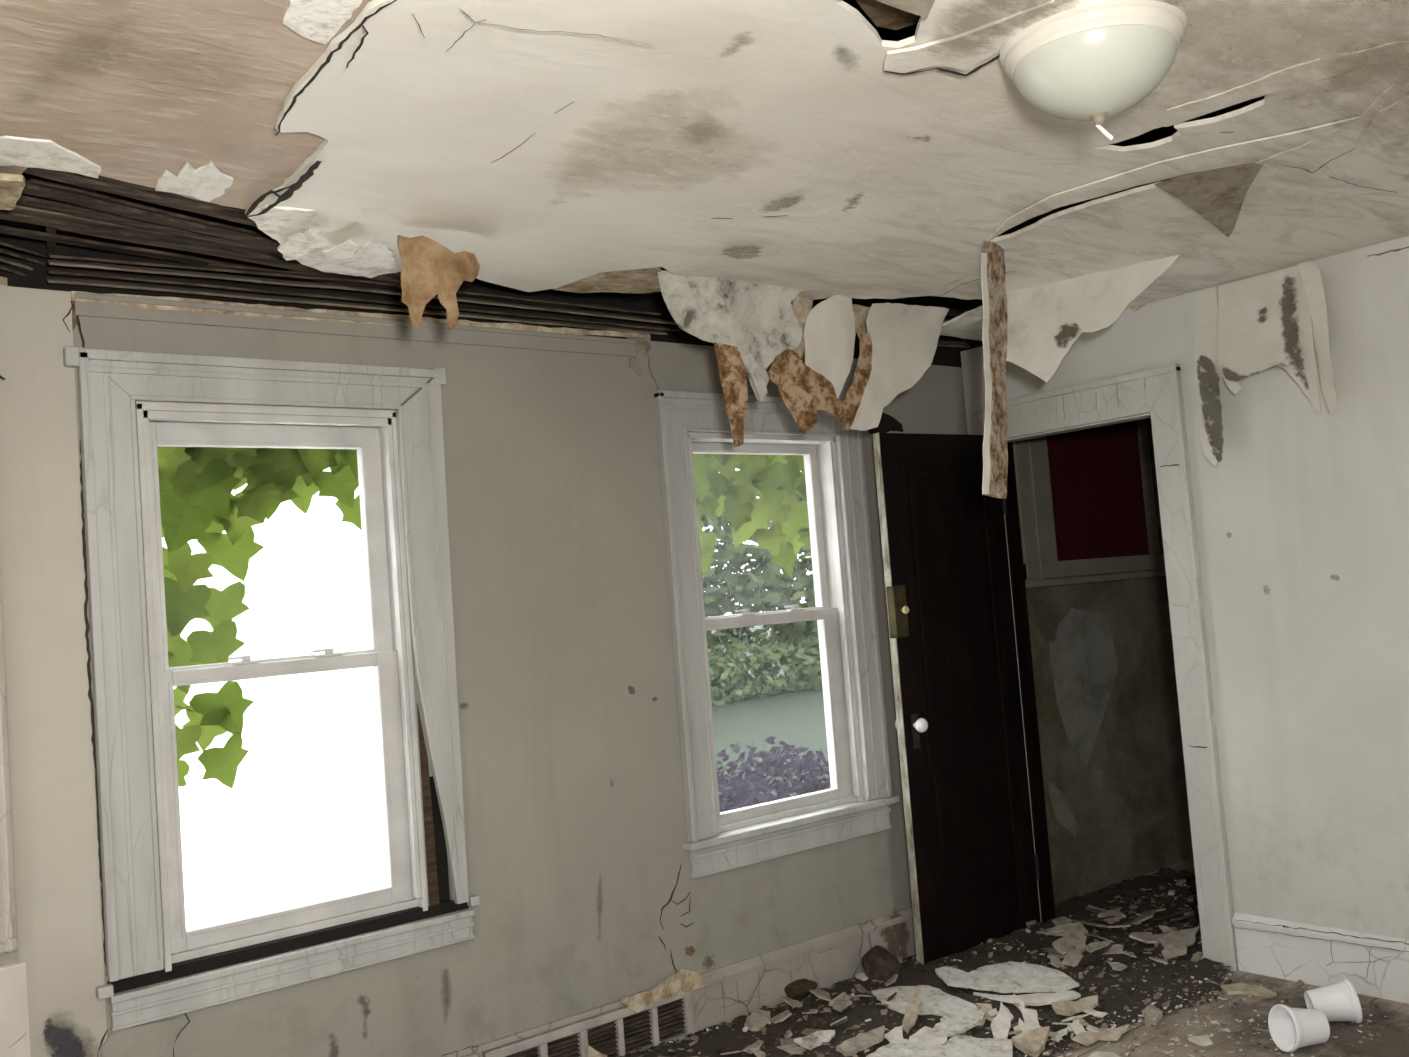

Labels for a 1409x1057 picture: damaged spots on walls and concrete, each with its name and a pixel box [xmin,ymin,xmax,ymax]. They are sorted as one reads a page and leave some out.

flaking render [876,0,1057,73]
leakage [945,0,1056,48]
crack [276,0,653,135]
flaking render [0,0,397,278]
flaking render [553,267,661,294]
spalling [869,412,904,434]
crack [659,865,693,972]
crack [1234,919,1409,978]
crack [173,1013,190,1057]